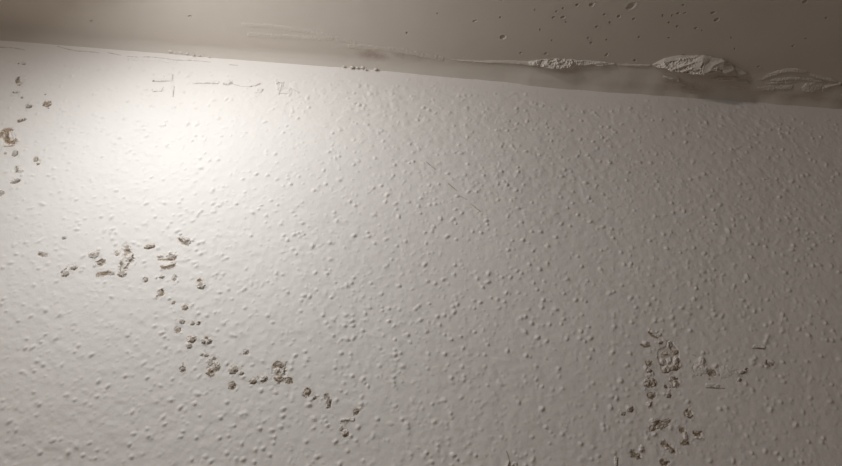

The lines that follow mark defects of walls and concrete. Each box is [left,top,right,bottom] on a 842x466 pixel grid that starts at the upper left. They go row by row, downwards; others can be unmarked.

spalling [9,74,55,123]
spalling [652,55,749,89]
spalling [0,147,43,200]
spalling [57,234,335,413]
spalling [617,337,683,419]
spalling [336,405,363,441]
spalling [644,405,706,466]